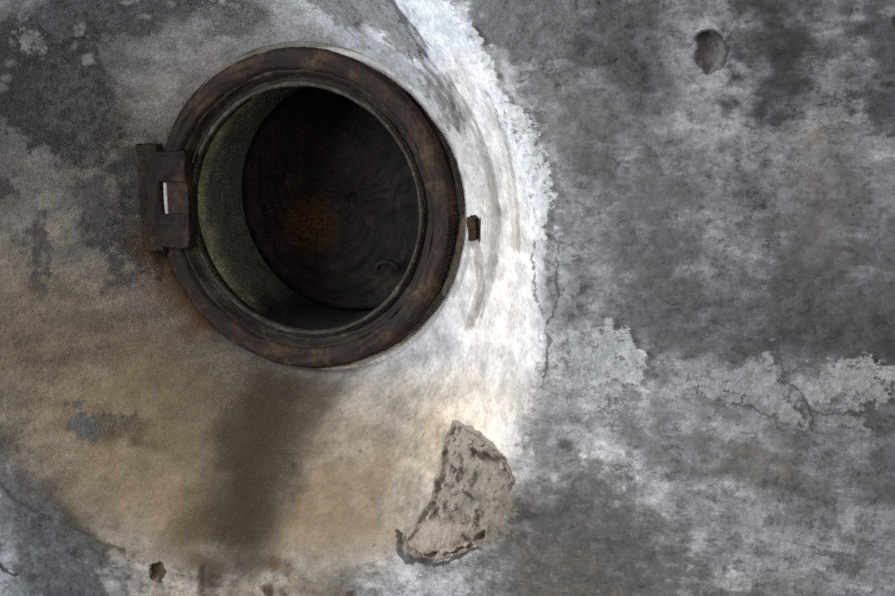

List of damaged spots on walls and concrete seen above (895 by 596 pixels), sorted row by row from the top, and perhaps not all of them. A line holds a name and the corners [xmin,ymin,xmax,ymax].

spalling [694,29,728,75]
peeling [62,398,146,446]
damp [199,366,337,562]
crack [0,483,33,512]
spalling [395,419,524,567]
damp [12,479,127,596]
crack [0,563,19,577]